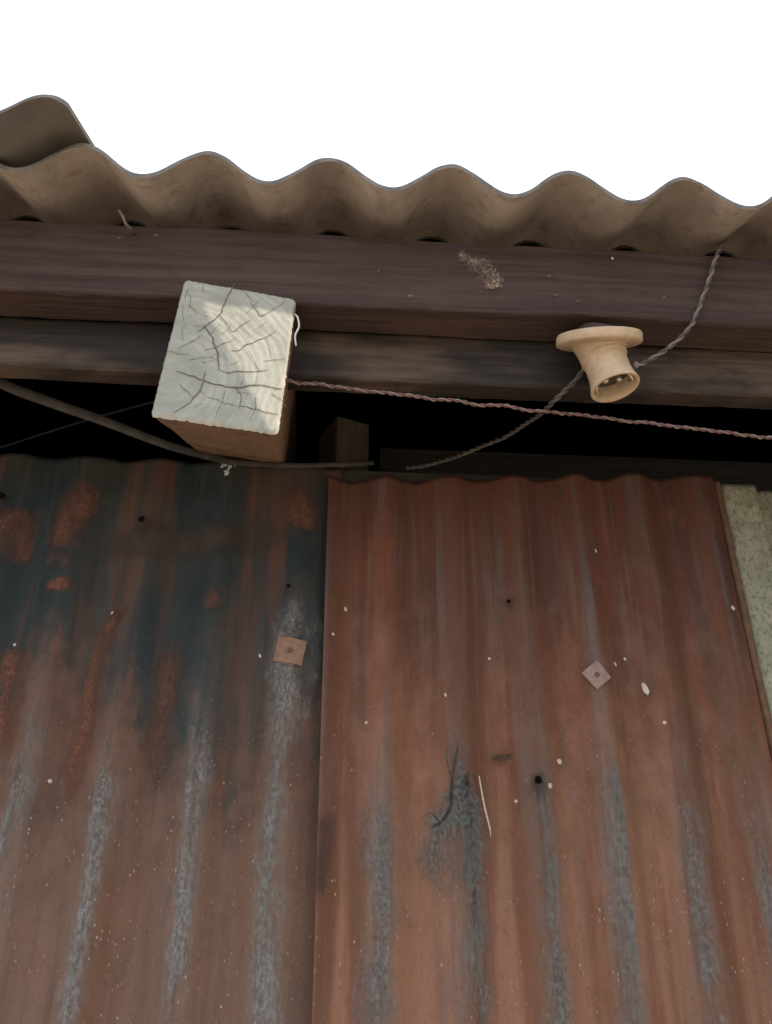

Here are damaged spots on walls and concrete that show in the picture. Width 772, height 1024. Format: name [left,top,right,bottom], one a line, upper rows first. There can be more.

crack [170,281,287,419]
rust [52,484,98,545]
rust [47,576,69,590]